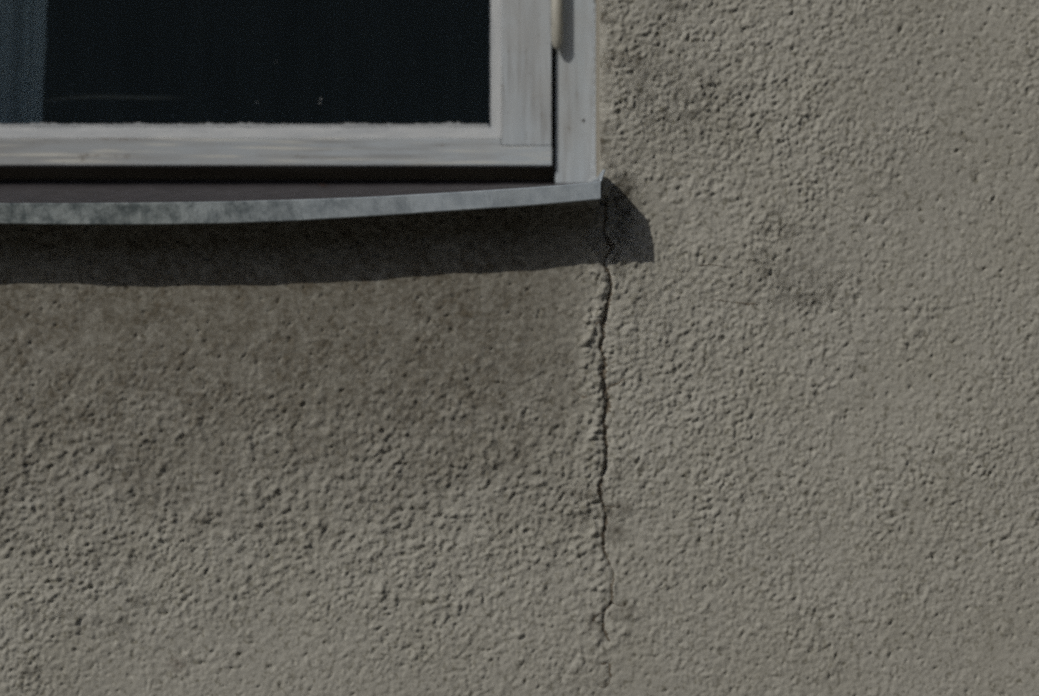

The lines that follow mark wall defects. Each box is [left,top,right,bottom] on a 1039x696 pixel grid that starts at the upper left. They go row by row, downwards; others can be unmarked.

crack [572,195,626,688]